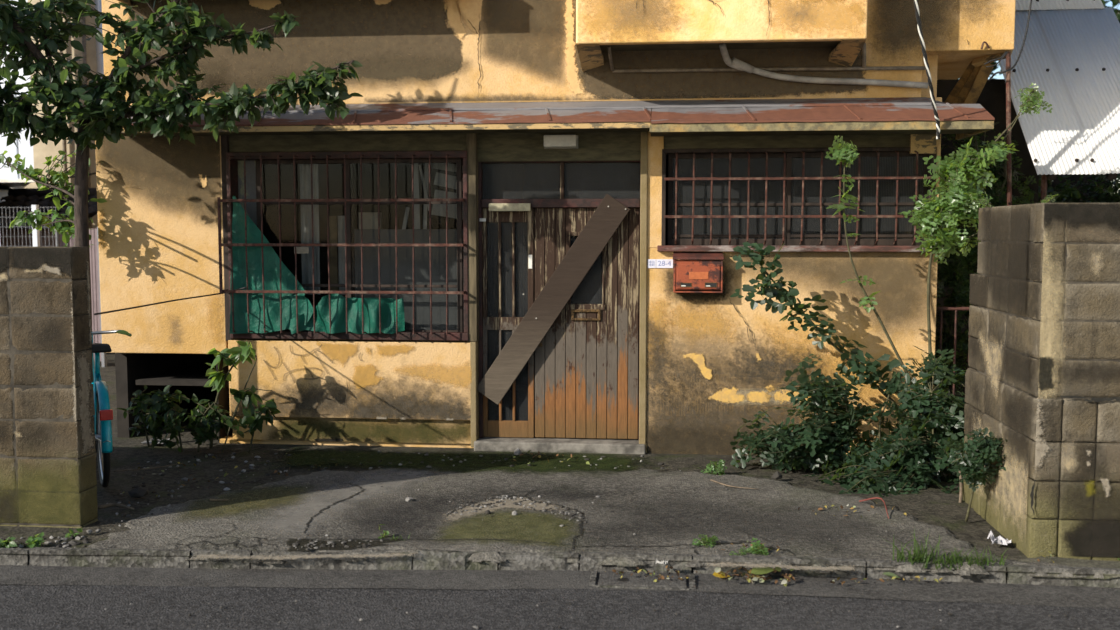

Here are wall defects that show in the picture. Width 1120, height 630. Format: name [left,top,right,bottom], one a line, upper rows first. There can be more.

water stain [127,0,462,95]
crack [467,14,481,88]
water stain [368,0,866,102]
water stain [231,383,471,420]
peeling [316,342,472,388]
peeling [683,353,810,404]
water stain [1058,444,1120,558]